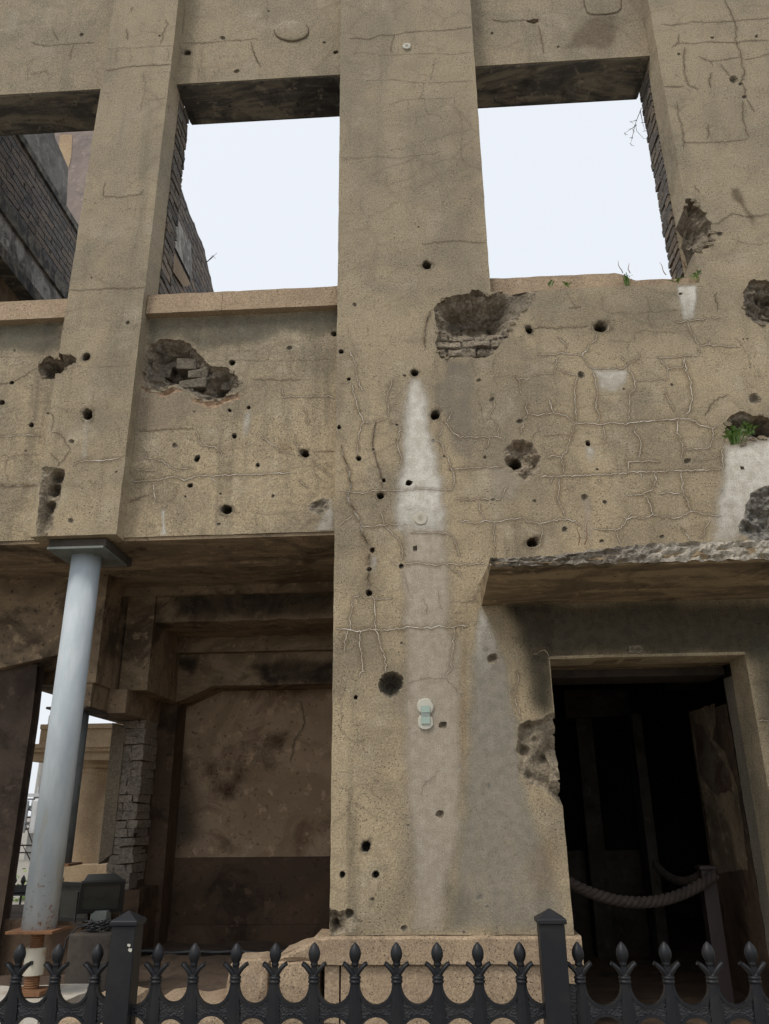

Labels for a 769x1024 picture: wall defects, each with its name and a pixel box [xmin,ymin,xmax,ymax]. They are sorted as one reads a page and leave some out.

crack [664,1,765,147]
peeling [683,198,723,253]
spalling [741,279,769,326]
spalling [38,352,77,380]
spalling [141,338,242,413]
spalling [723,392,769,447]
spalling [36,466,66,540]
crack [2,290,751,742]
spalling [489,486,769,567]
damp [718,439,769,538]
damp [397,380,549,928]
spalling [515,713,563,806]